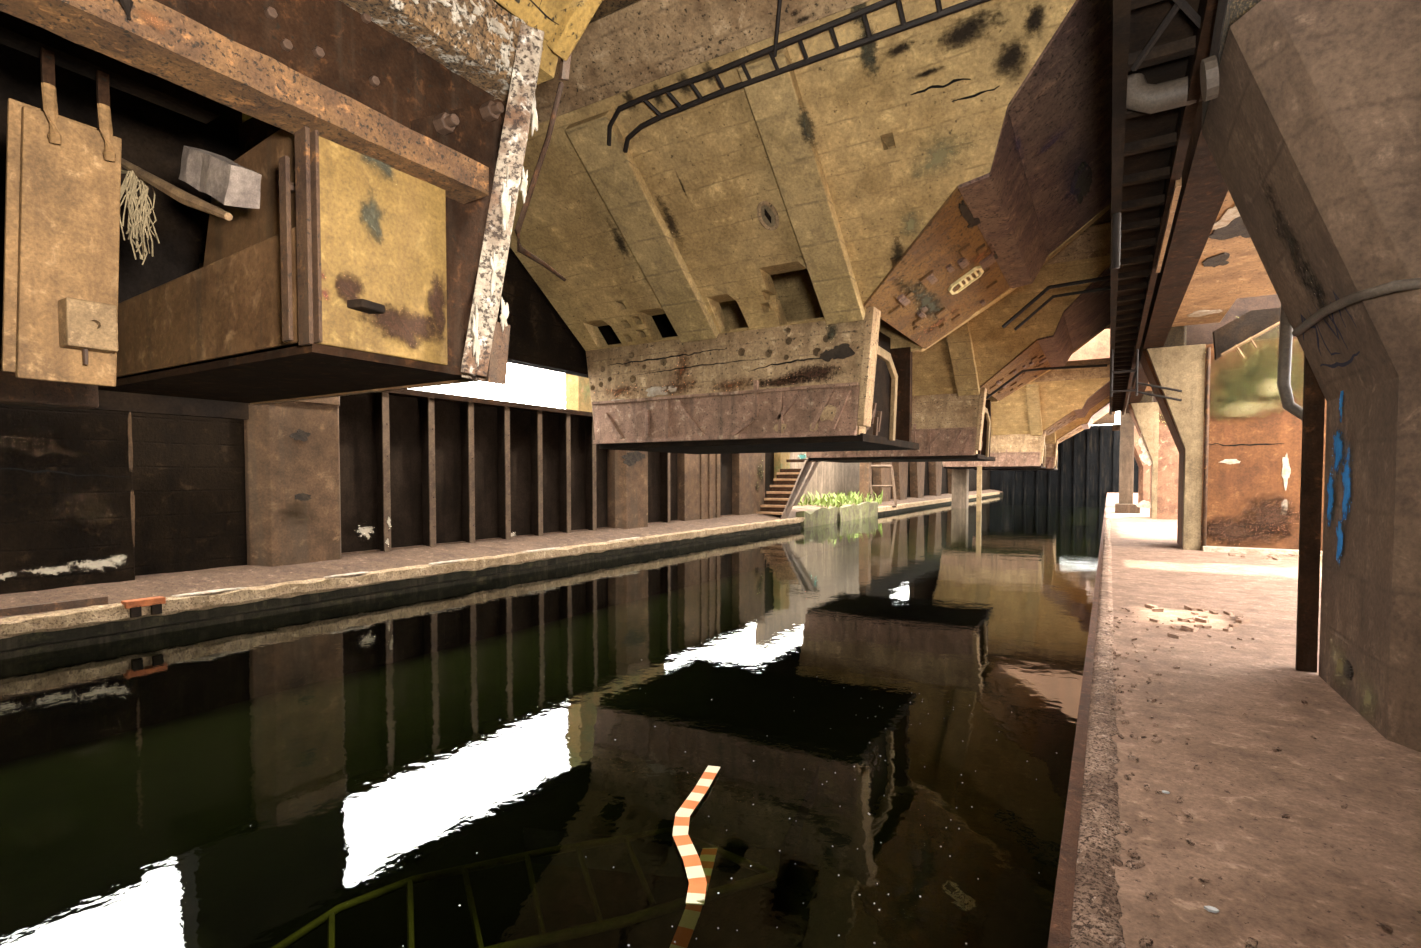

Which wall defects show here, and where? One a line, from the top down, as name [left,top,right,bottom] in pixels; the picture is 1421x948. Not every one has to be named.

peeling [470,0,510,68]
peeling [472,166,528,367]
corrosion [322,273,446,349]
spalling [819,343,855,362]
spalling [646,386,677,397]
water stain [0,554,127,580]